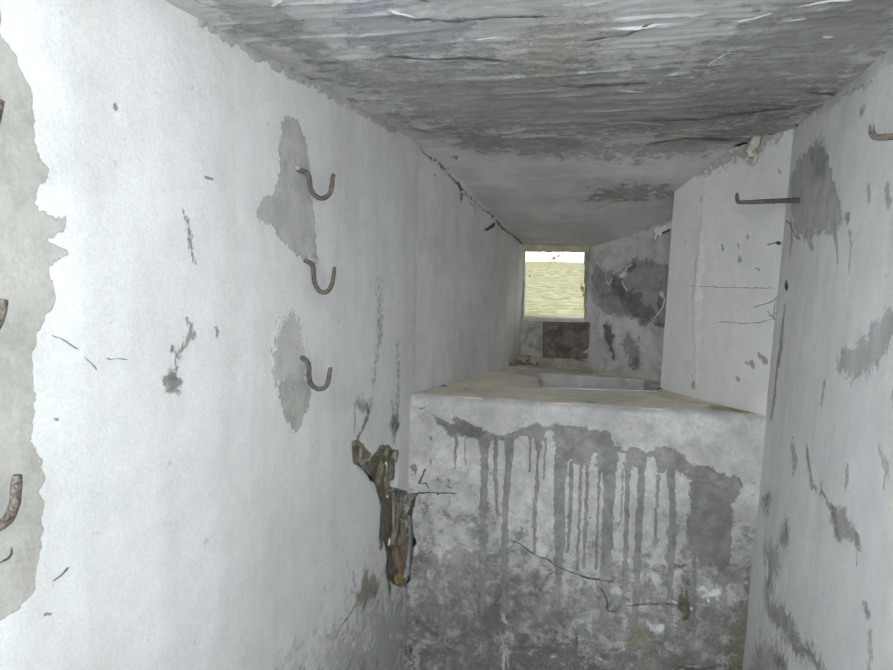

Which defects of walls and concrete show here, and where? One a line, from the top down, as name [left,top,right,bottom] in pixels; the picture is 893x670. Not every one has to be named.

flaking render [654,222,672,239]
damp [602,322,642,372]
spalling [335,440,418,638]
damp [325,415,749,670]
crack [511,540,676,613]